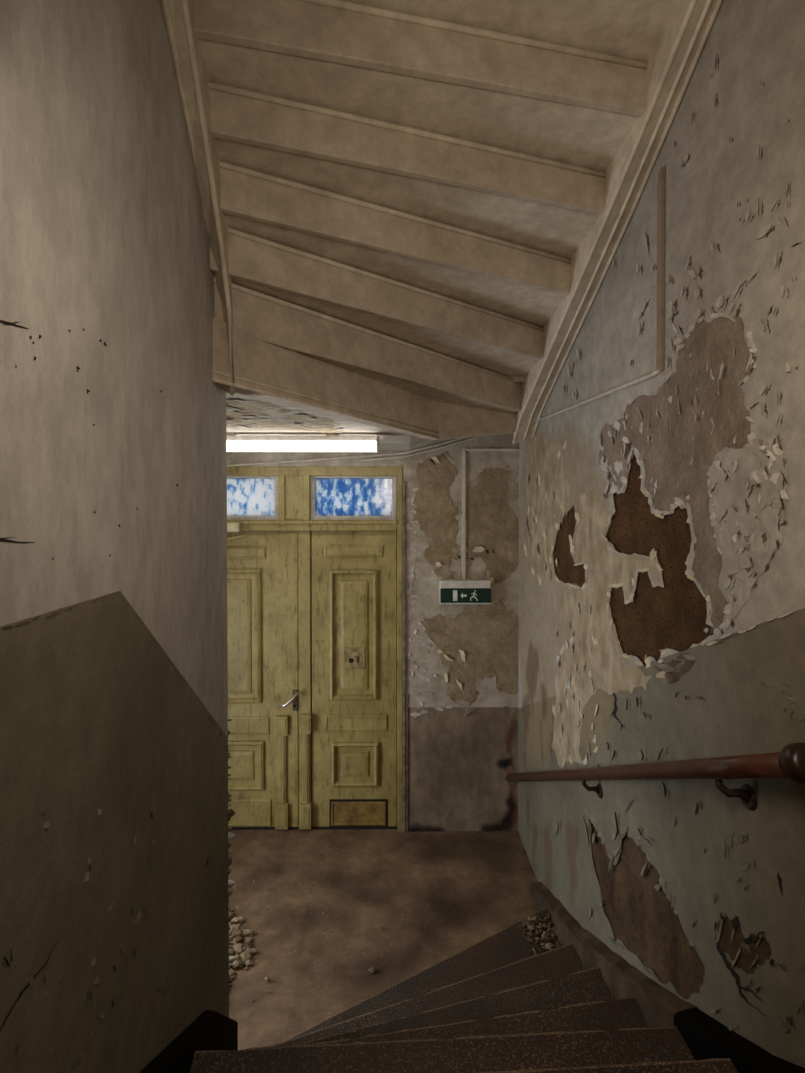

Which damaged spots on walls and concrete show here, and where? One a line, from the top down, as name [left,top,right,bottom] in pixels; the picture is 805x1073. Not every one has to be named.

crack [0,320,29,329]
crack [0,536,33,544]
peeling [410,452,519,718]
peeling [549,231,797,768]
spalling [583,799,705,999]
peeling [713,894,805,995]